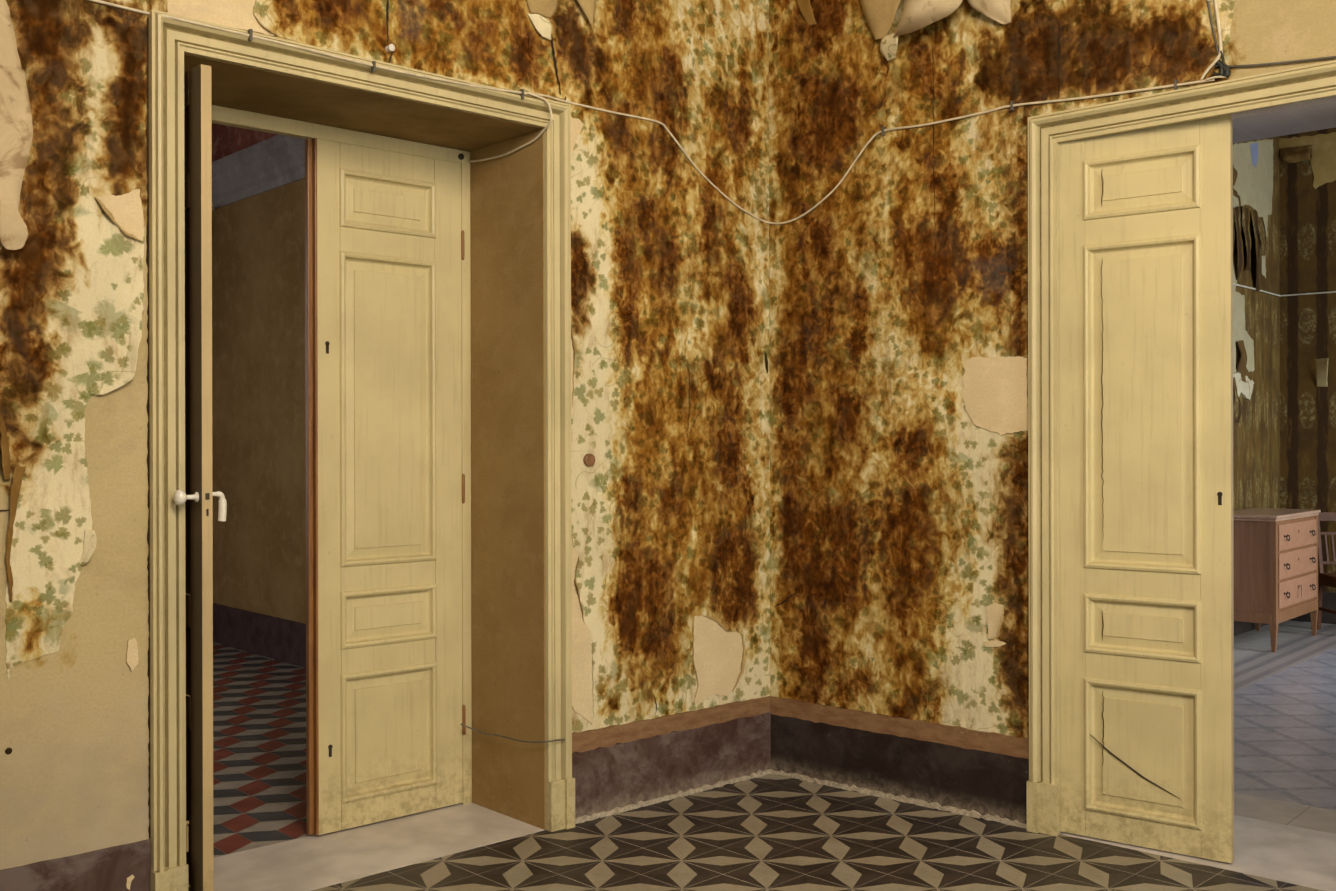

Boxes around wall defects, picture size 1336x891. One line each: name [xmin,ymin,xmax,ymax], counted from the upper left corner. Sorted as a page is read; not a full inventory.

water stain [0,0,154,477]
peeling [95,189,144,241]
water stain [275,0,1232,739]
peeling [962,356,1028,435]
peeling [1233,255,1255,401]
water stain [26,604,42,651]
flaking render [126,638,138,672]
peeling [692,615,746,704]